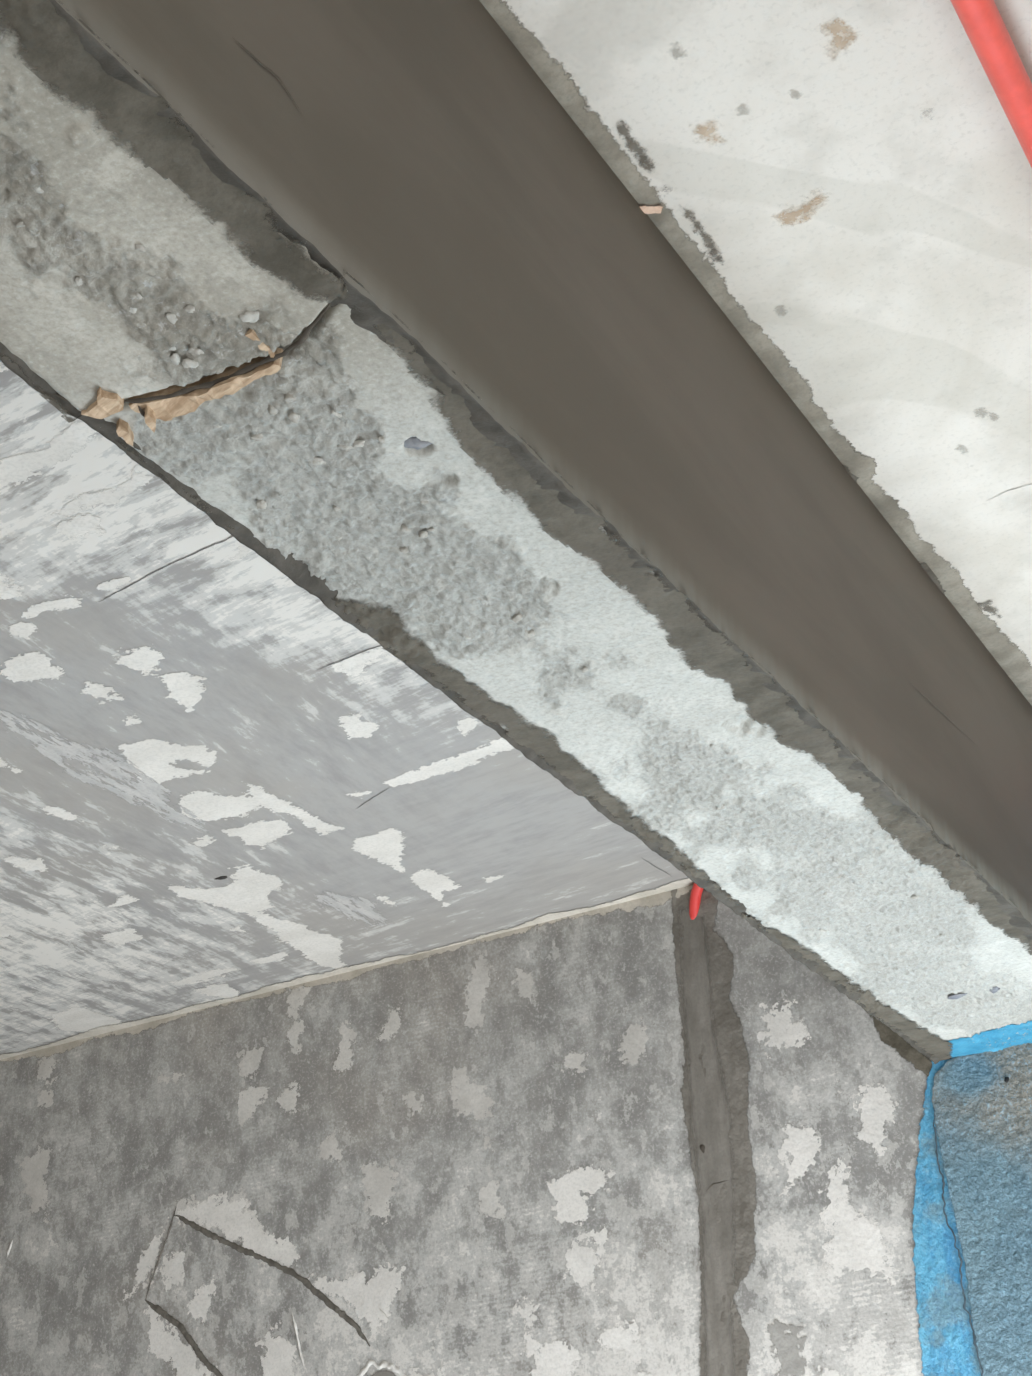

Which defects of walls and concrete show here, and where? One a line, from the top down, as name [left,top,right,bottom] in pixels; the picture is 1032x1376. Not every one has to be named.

rust [827,21,854,48]
rust [779,198,821,224]
crack [124,303,331,417]
crack [145,1208,370,1376]